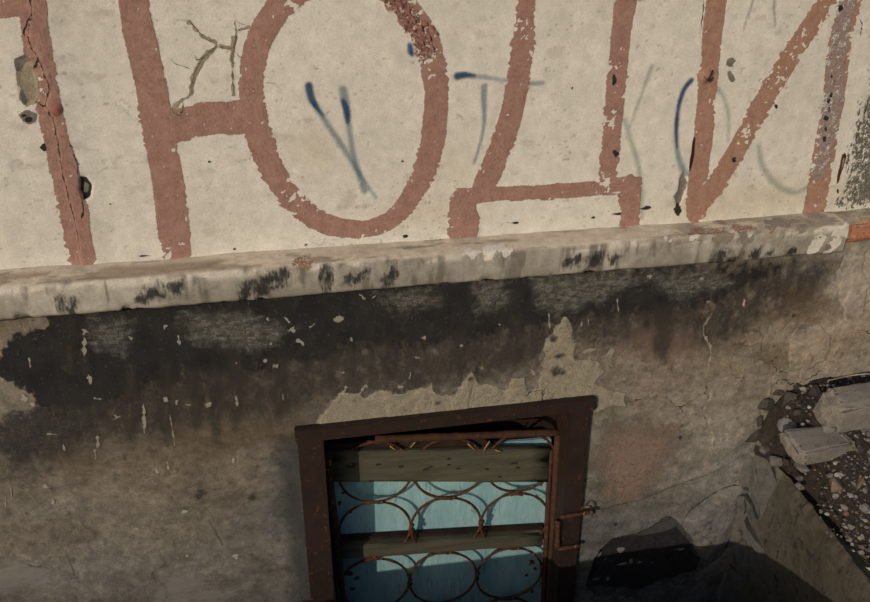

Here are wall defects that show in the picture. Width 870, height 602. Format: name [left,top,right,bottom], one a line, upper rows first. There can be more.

peeling [14,54,40,124]
crack [23,0,84,249]
crack [168,20,250,116]
peeling [764,217,808,234]
flaking render [807,78,870,327]
flaking render [316,317,626,424]
crack [627,310,735,421]
crack [771,356,822,388]
crack [581,452,747,531]
spalling [586,516,708,599]